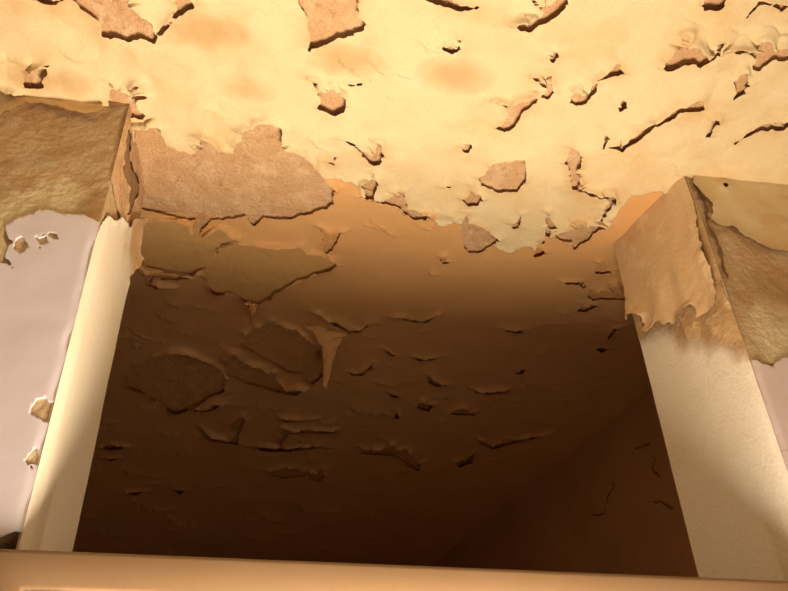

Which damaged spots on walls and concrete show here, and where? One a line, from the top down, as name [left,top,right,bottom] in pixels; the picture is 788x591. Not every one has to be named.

peeling [73,0,211,44]
peeling [298,0,377,52]
peeling [429,28,474,50]
peeling [495,0,589,32]
peeling [522,41,636,97]
peeling [686,0,726,11]
peeling [646,18,788,99]
peeling [761,0,788,8]
peeling [764,112,788,131]
peeling [558,137,626,206]
peeling [613,176,788,364]
peeling [0,50,608,552]